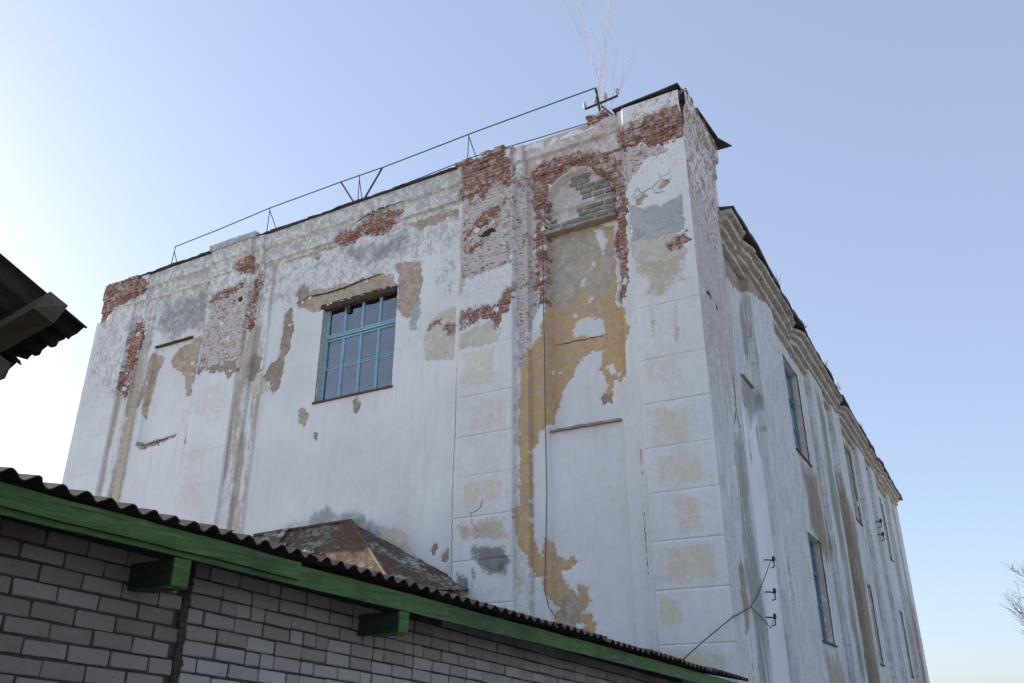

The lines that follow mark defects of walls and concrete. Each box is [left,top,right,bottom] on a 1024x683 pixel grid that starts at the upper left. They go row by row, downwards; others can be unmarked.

peeling [116,104,765,420]
spalling [101,277,149,323]
peeling [136,434,186,450]
peeling [517,414,534,537]
leakage [457,522,510,592]
peeling [557,592,585,629]